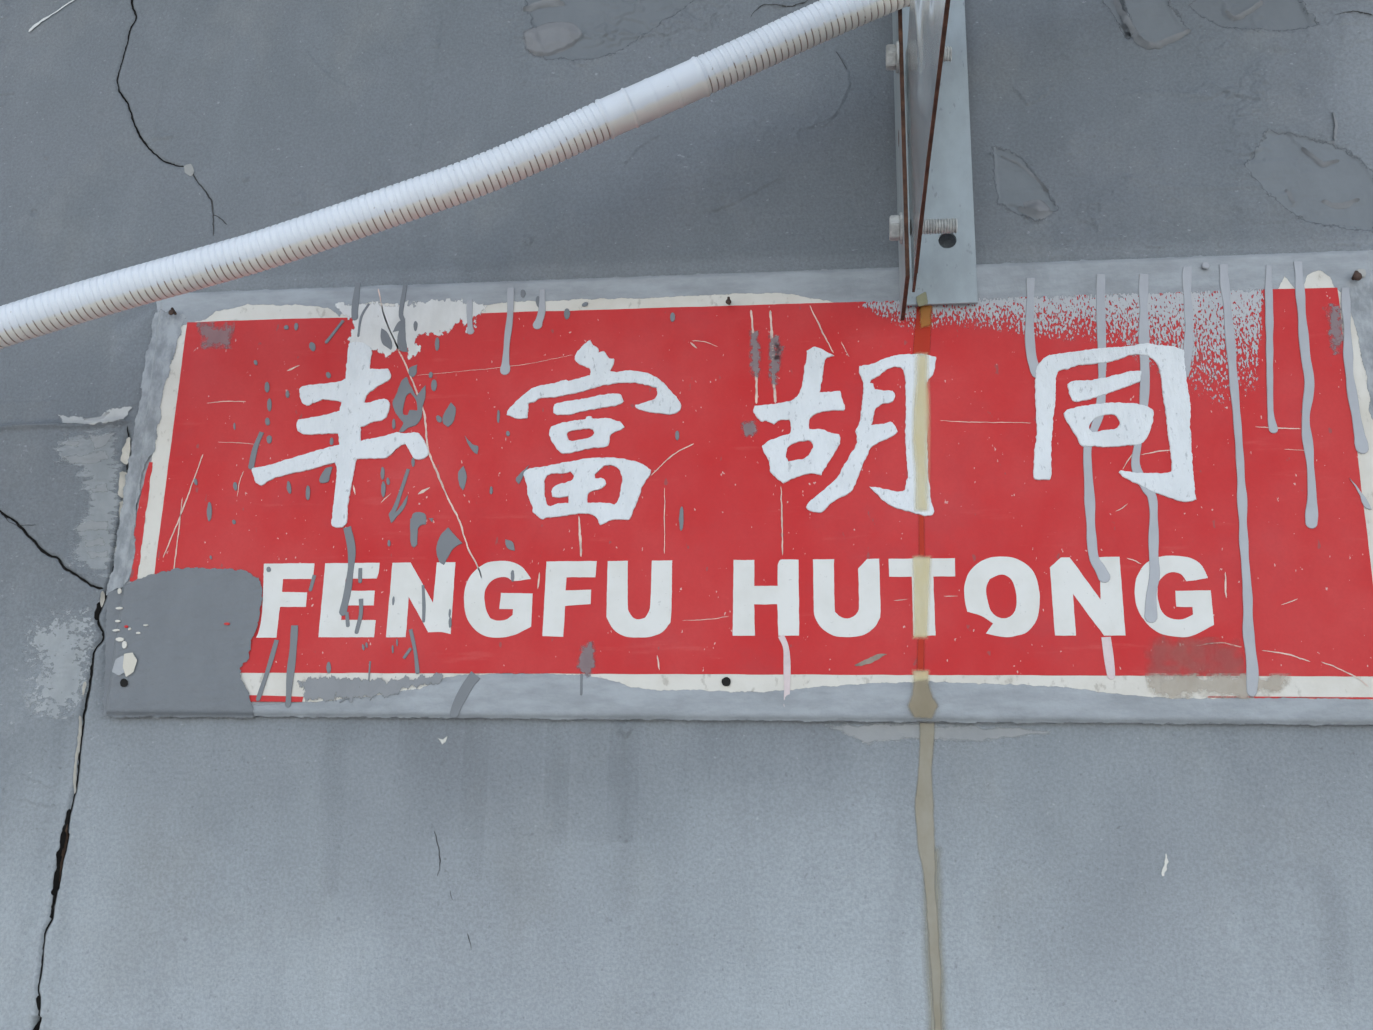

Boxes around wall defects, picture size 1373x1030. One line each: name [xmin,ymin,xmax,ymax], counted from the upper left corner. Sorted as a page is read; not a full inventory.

crack [116,0,227,236]
peeling [1103,0,1191,49]
crack [0,426,130,1030]
rust [909,305,943,1030]